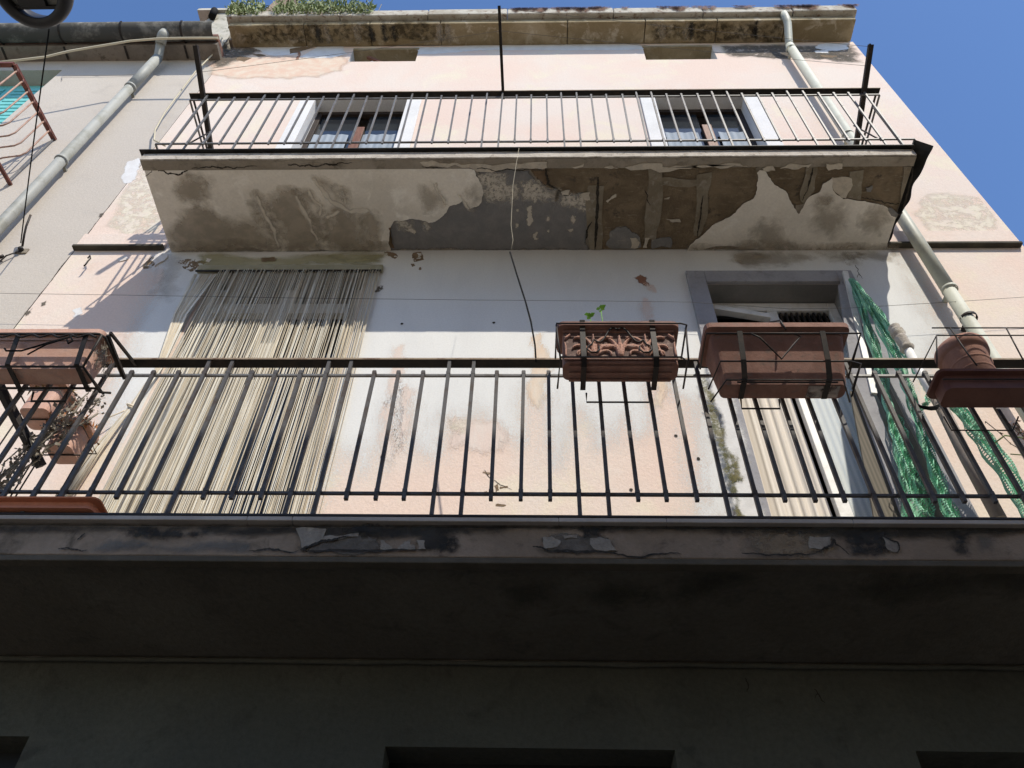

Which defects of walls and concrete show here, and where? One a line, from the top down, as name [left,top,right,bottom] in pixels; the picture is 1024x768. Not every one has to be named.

crack [146,166,257,176]
crack [290,160,352,168]
leakage [172,174,383,265]
rust [635,275,657,321]
peeling [68,158,962,516]
spalling [296,527,426,556]
spalling [542,533,616,555]
spalling [750,534,832,558]